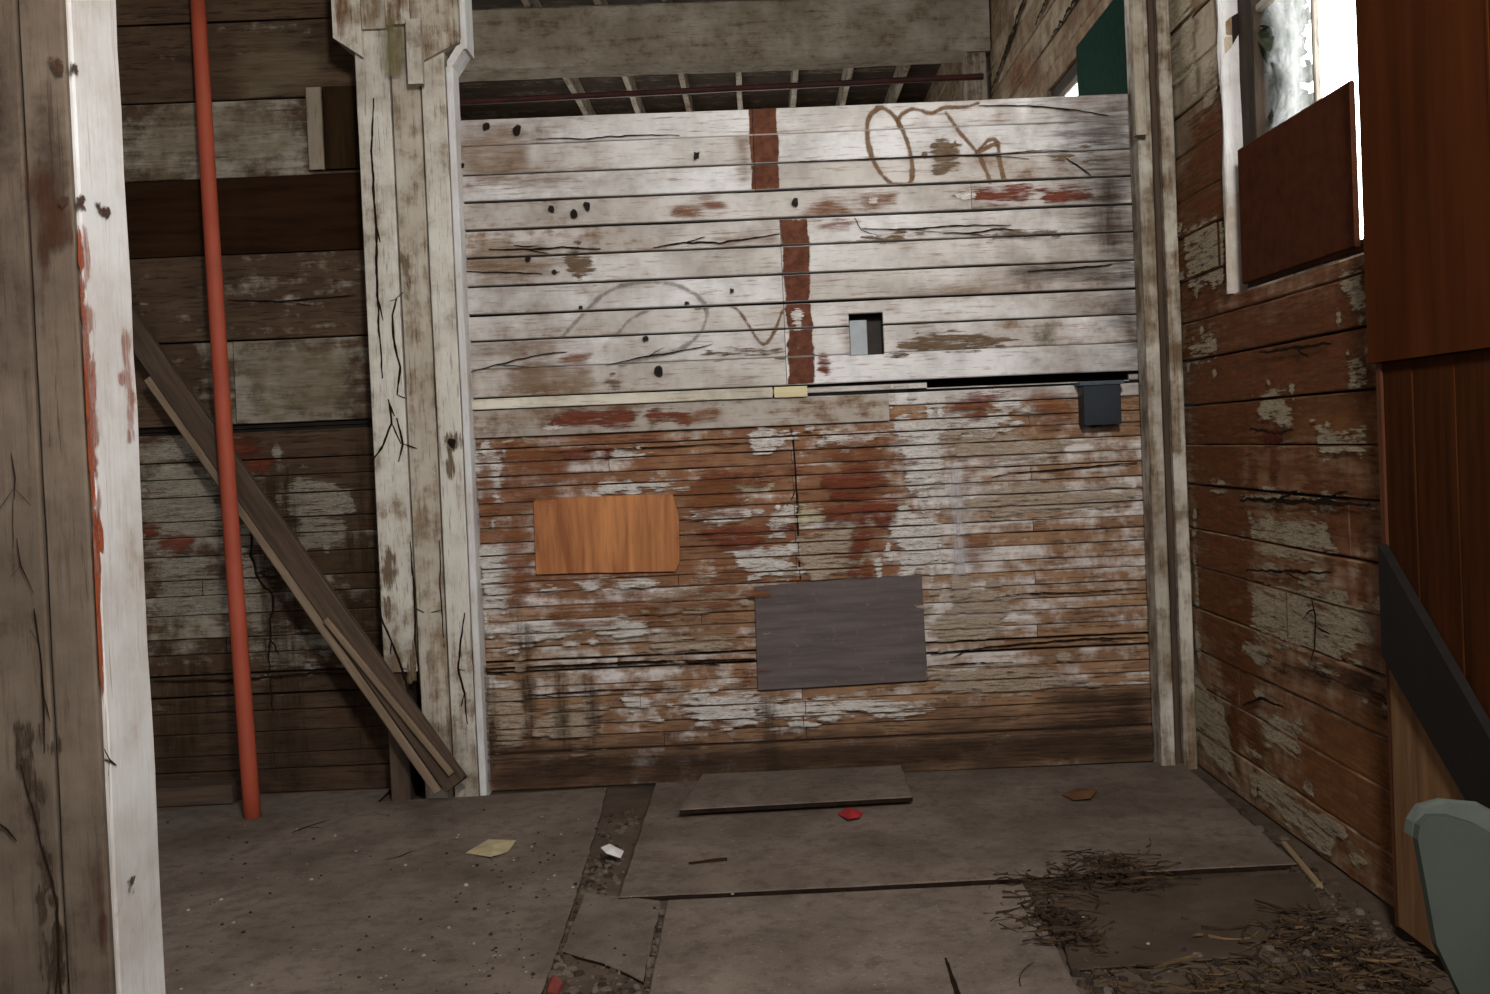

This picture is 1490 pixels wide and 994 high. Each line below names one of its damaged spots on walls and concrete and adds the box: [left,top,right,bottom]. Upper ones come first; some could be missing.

crack [979,0,1109,116]
crack [799,150,1091,176]
crack [228,98,417,465]
peeling [1177,212,1226,298]
peeling [1335,258,1366,327]
peeling [701,346,785,362]
peeling [886,329,1019,358]
peeling [1186,326,1217,378]
peeling [1252,379,1367,461]
crack [1240,491,1371,507]
peeling [445,373,1143,759]
peeling [1187,478,1388,868]